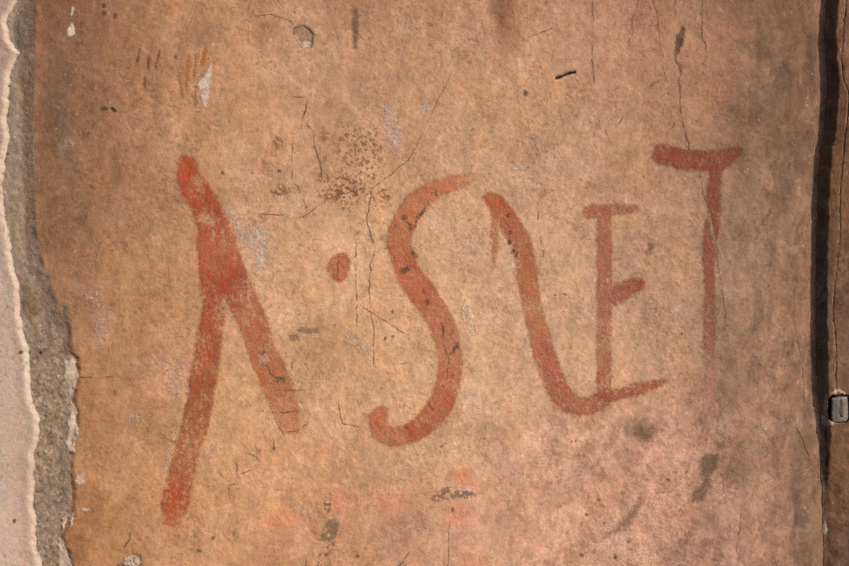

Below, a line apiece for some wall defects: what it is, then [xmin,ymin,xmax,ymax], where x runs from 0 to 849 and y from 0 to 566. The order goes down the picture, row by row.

spalling [293,25,314,48]
crack [298,96,322,177]
crack [663,58,690,147]
crack [330,136,422,335]
crack [832,7,849,378]
spalling [118,554,141,566]